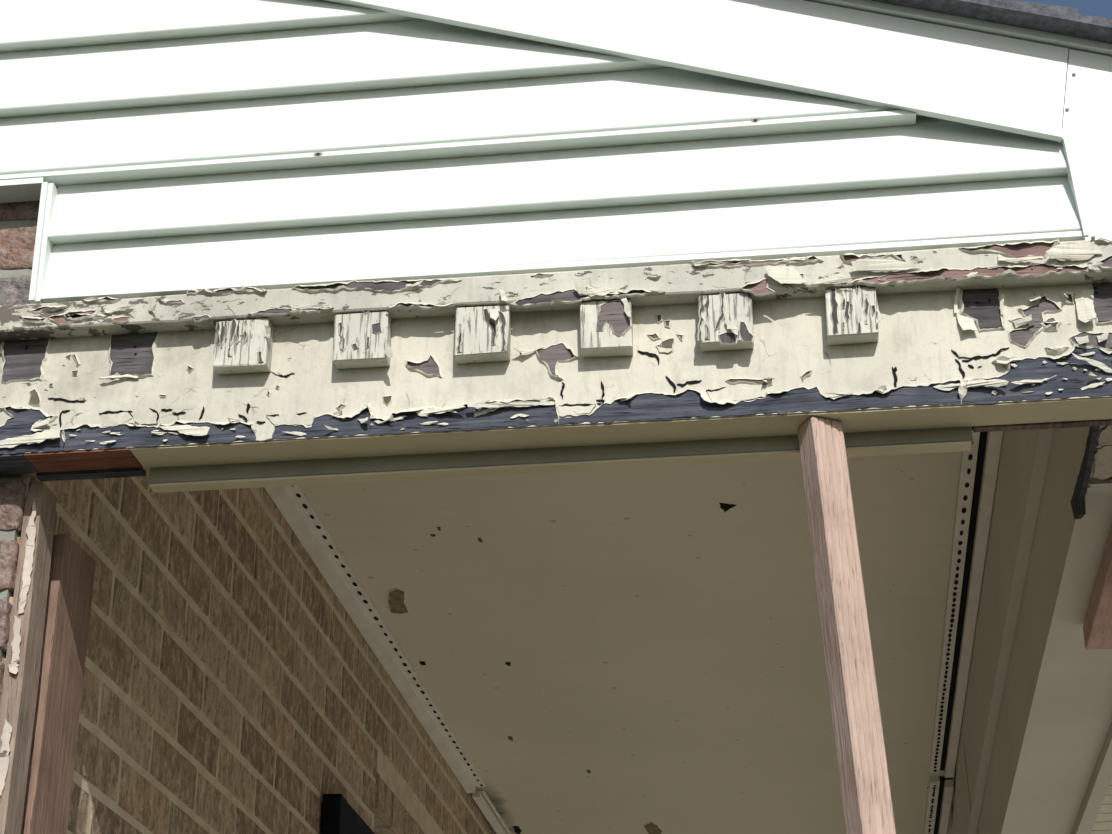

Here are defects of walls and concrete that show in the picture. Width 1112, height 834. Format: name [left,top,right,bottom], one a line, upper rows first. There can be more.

peeling [0,383,124,448]
peeling [151,424,246,442]
peeling [148,287,267,312]
peeling [192,278,462,363]
peeling [405,354,442,378]
peeling [324,395,555,431]
peeling [483,274,665,380]
peeling [647,292,755,353]
peeling [726,377,774,387]
peeling [688,236,1112,334]
peeling [934,289,1112,395]
peeling [8,473,36,674]